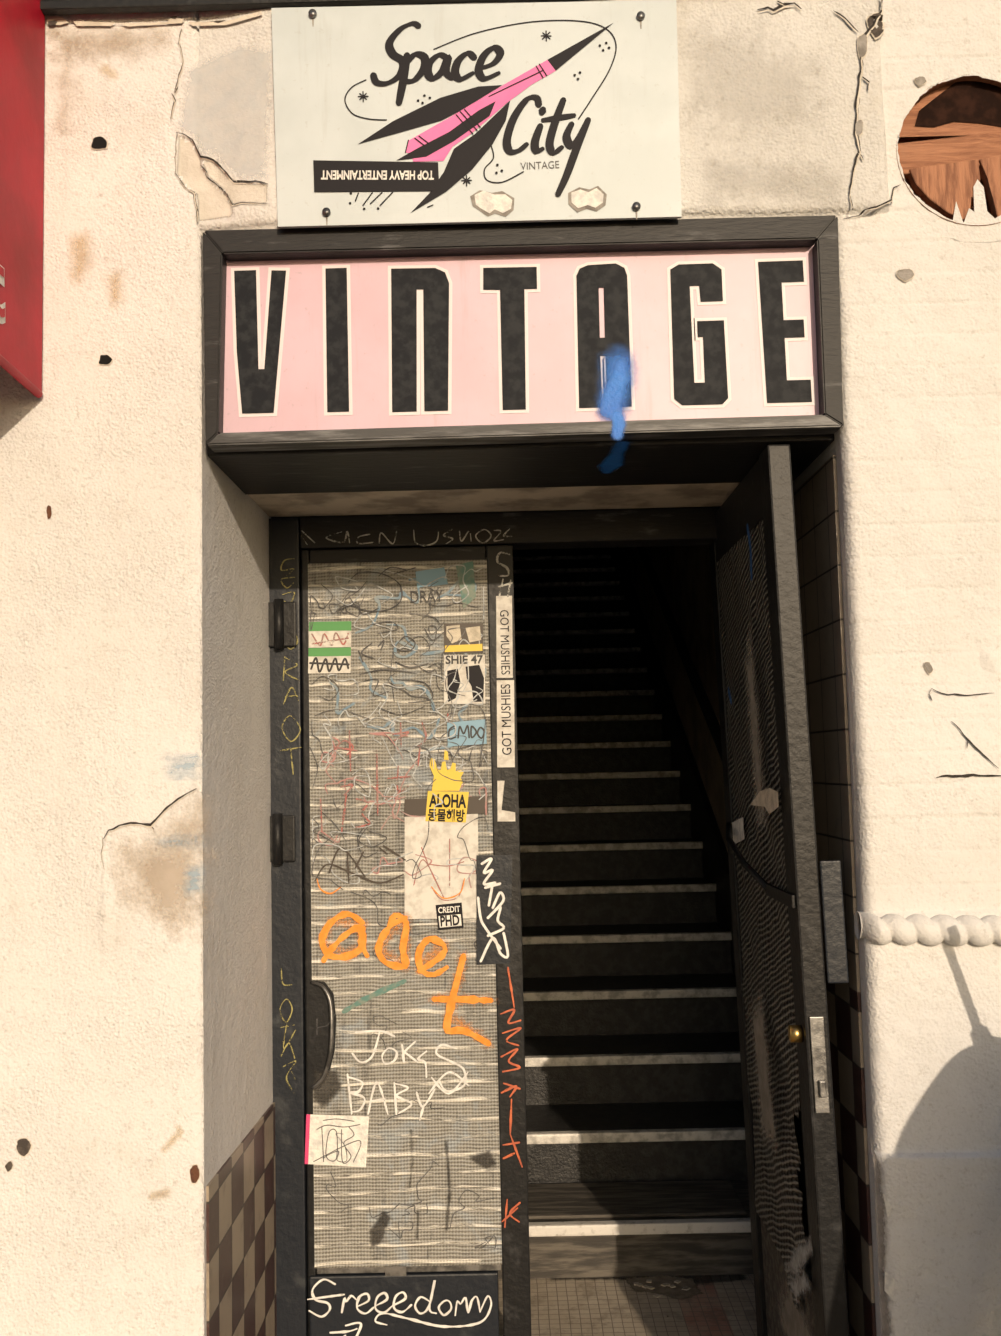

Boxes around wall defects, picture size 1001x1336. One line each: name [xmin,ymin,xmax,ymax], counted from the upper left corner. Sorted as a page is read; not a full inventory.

crack [757,1,802,13]
crack [170,29,268,223]
peeling [177,137,267,220]
crack [834,0,901,220]